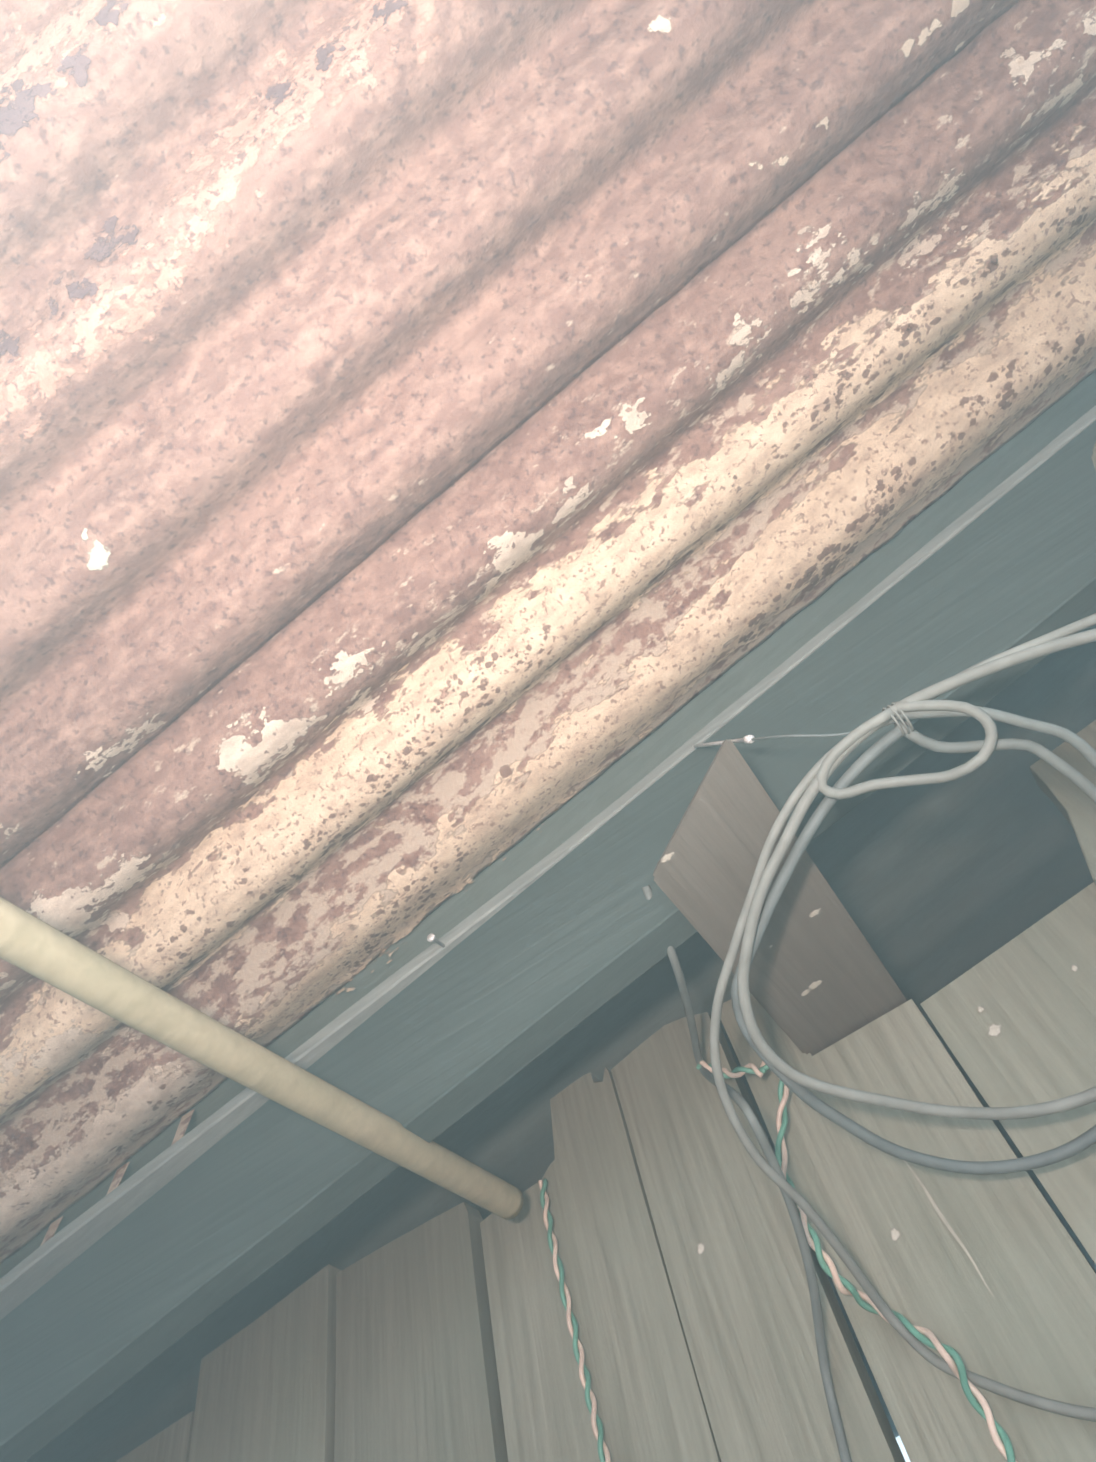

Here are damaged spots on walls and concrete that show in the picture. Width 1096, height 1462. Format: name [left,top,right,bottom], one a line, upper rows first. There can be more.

peeling [899,0,970,57]
peeling [1000,39,1093,140]
peeling [705,168,970,400]
peeling [81,528,111,570]
peeling [475,476,594,602]
water stain [96,125,1096,1041]
peeling [584,397,652,439]
spalling [735,302,1084,652]
peeling [75,712,167,780]
peeling [26,852,179,937]
water stain [0,981,122,1122]
peeling [0,1057,212,1239]